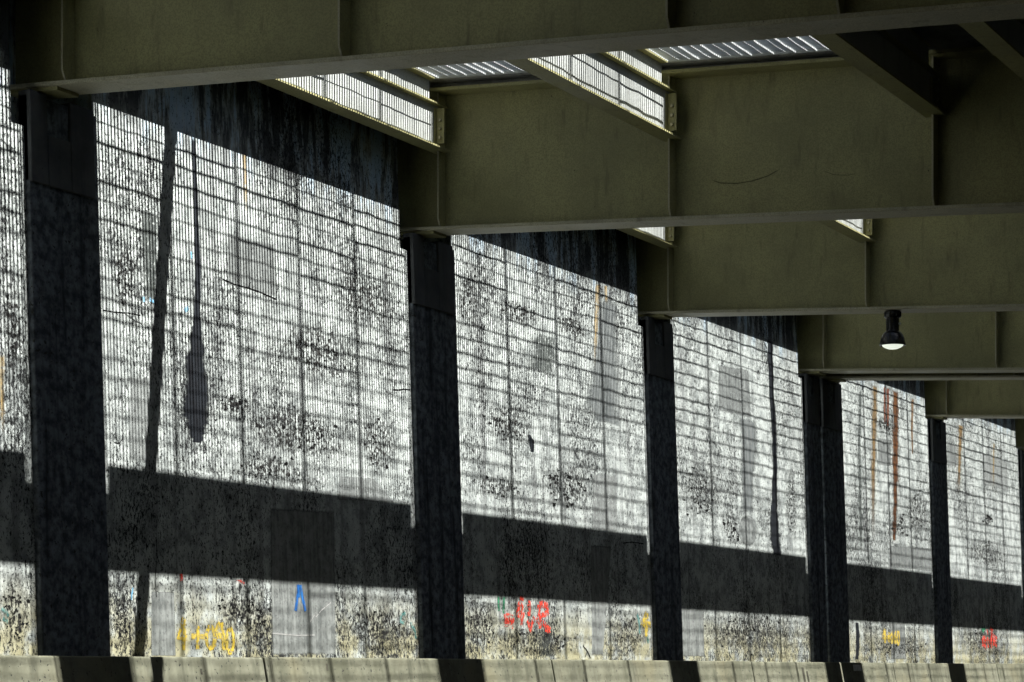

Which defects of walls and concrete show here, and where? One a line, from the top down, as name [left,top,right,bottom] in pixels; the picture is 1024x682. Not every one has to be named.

rust [872,386,898,540]